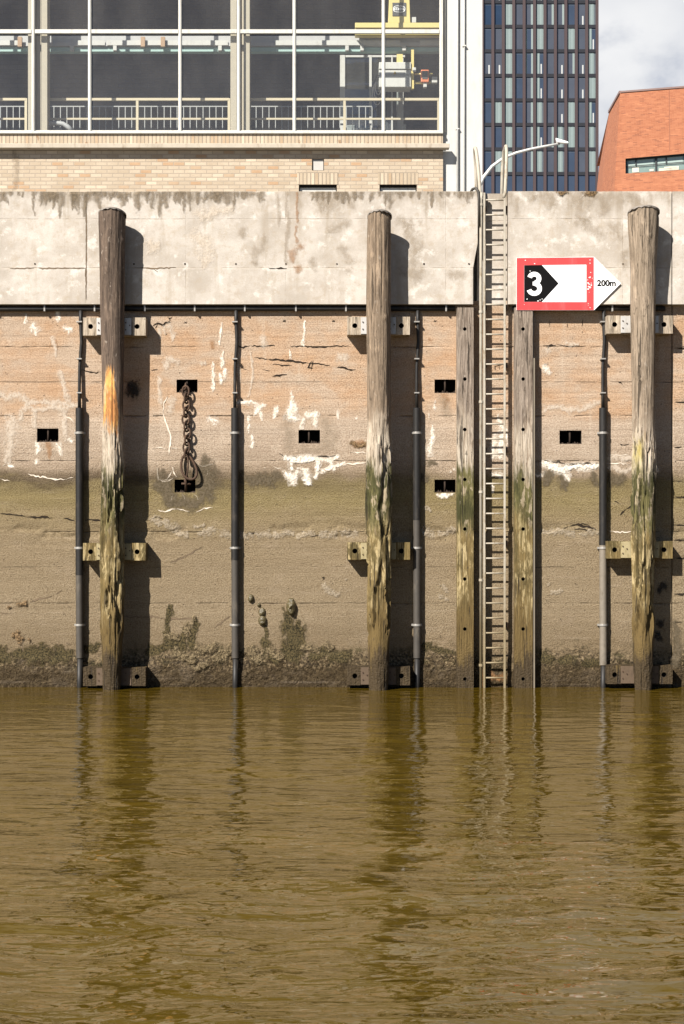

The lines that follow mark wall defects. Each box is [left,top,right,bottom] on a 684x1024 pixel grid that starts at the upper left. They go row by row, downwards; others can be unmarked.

leakage [0,191,264,220]
leakage [201,323,253,391]
crack [238,345,356,377]
leakage [2,371,78,467]
leakage [239,454,346,488]
leakage [535,455,631,491]
leakage [144,604,200,656]
leakage [260,606,352,664]
leakage [0,642,101,667]